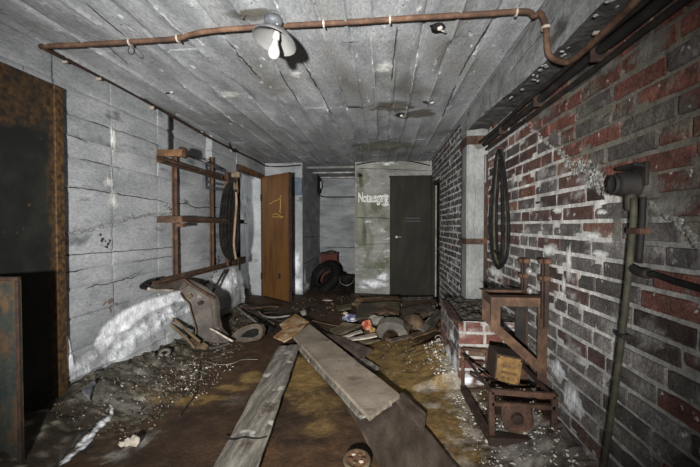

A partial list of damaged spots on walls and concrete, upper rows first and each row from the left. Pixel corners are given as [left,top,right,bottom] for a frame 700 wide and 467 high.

crack [229,43,261,79]
crack [442,20,492,117]
crack [65,231,180,289]
water stain [207,269,238,294]
water stain [67,290,190,380]